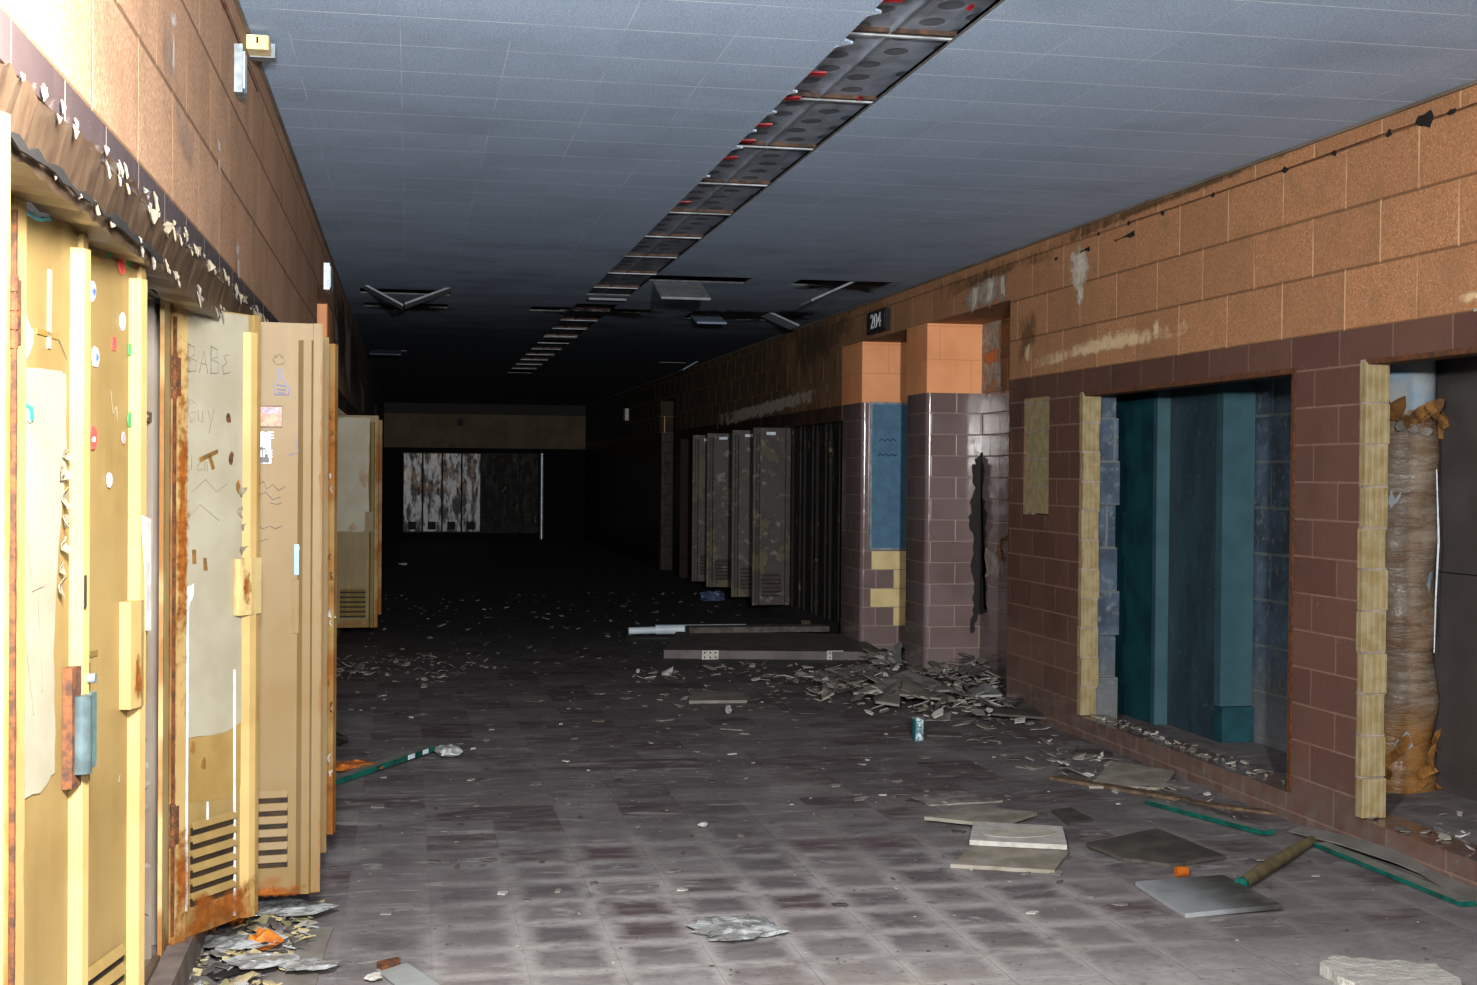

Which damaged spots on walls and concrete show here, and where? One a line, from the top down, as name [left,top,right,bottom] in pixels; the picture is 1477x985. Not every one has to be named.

peeling [20,72,80,139]
peeling [104,145,268,323]
peeling [964,273,1007,397]
rust [177,393,188,626]
spalling [968,453,1004,633]
spalling [1024,396,1050,514]
rust [175,830,298,932]